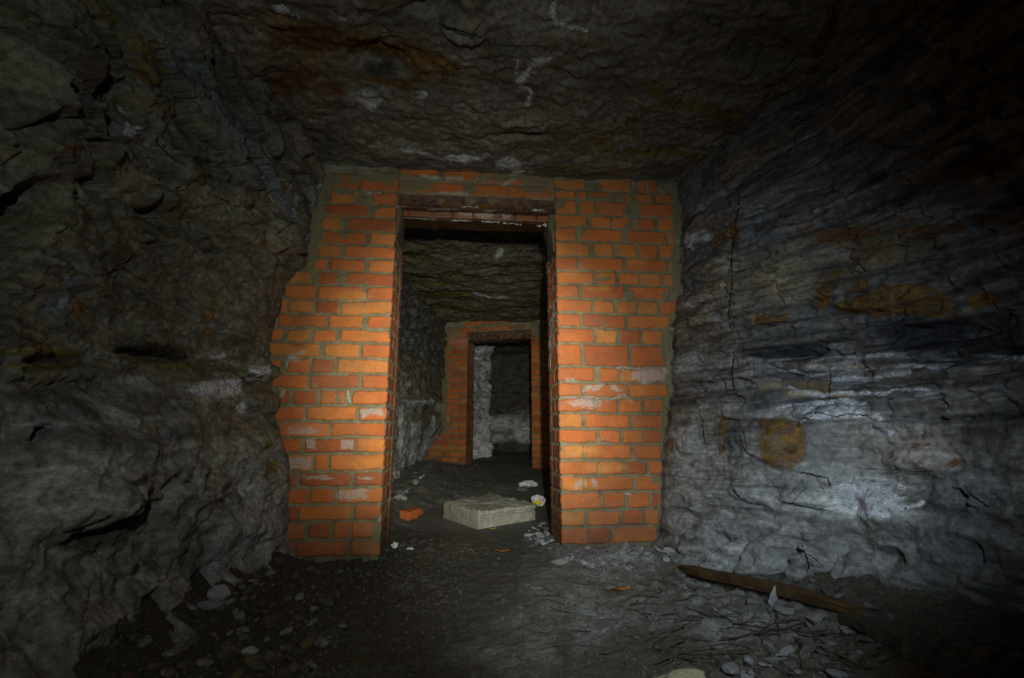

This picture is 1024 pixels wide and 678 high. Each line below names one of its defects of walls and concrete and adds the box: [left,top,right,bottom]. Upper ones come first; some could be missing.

crack [724,185,747,450]
damp [616,366,667,384]
damp [569,383,633,410]
crack [794,368,876,427]
damp [266,427,333,480]
crack [866,466,934,474]
damp [336,477,371,501]
crack [730,472,834,512]
crack [964,485,990,508]
crack [801,544,820,573]